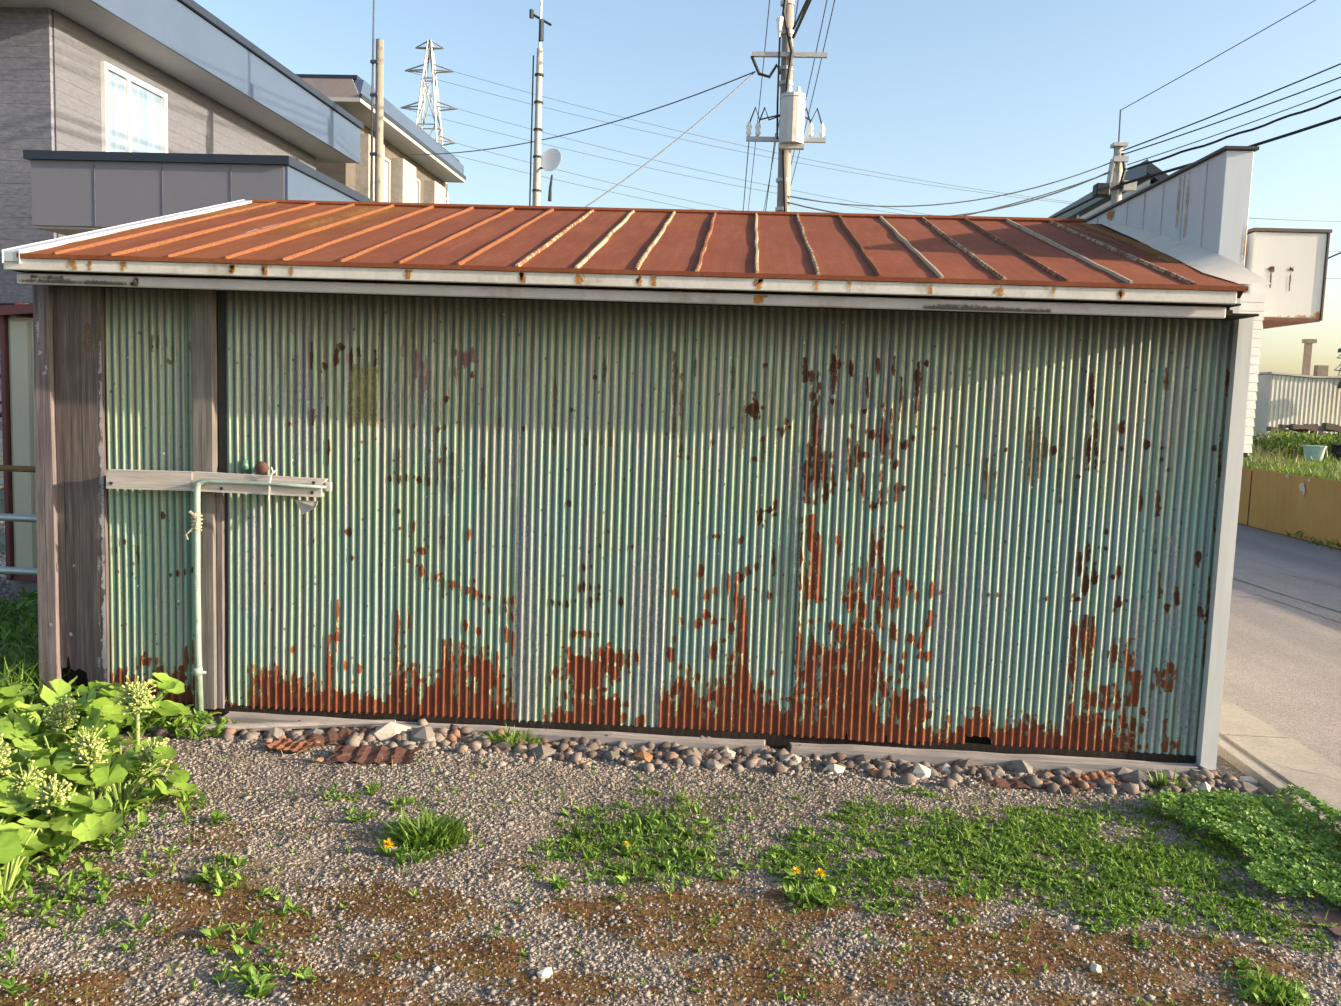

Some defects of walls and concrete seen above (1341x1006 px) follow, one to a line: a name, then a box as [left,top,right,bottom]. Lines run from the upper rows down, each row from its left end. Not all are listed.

corrosion [71,203,286,243]
corrosion [285,206,405,232]
corrosion [1065,209,1179,262]
peeling [454,347,478,376]
corrosion [388,425,455,501]
corrosion [543,352,1180,755]
corrosion [225,509,519,720]